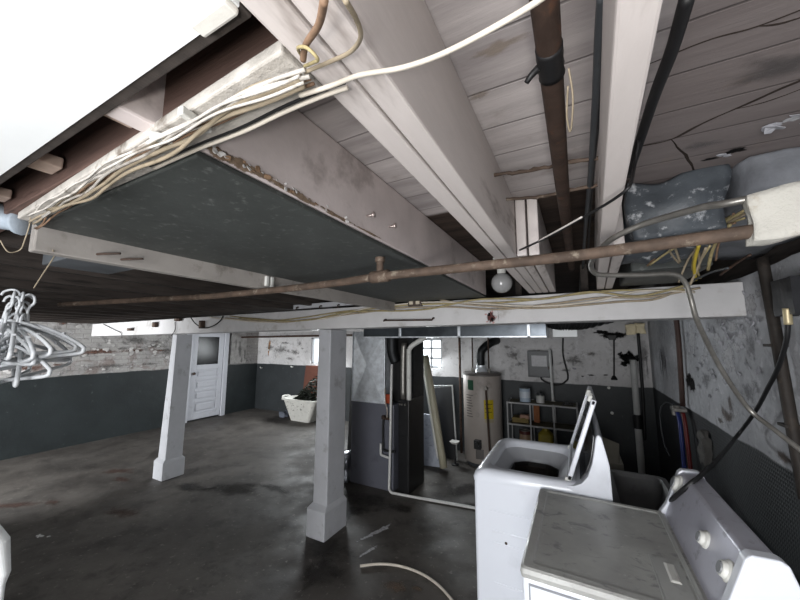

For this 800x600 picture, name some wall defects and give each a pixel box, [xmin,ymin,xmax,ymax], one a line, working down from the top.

crack [643,80,800,170]
peeling [761,114,800,134]
peeling [207,145,381,239]